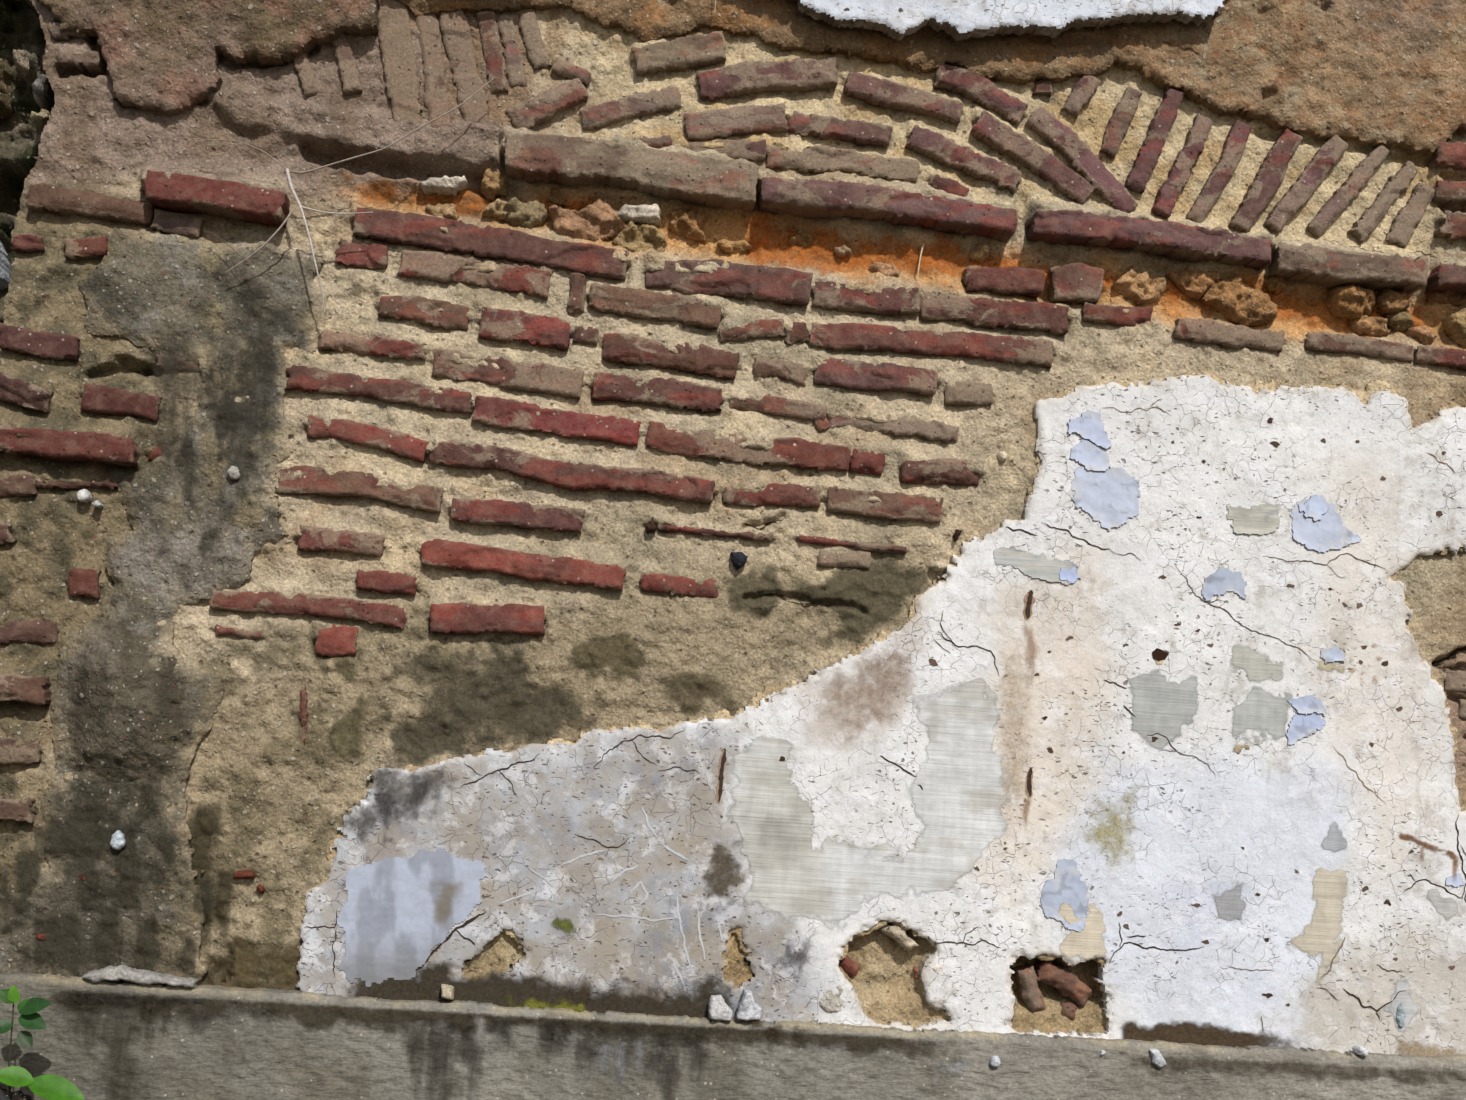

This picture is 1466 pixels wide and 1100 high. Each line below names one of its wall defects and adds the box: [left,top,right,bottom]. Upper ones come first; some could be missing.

leakage [158,282,302,507]
crack [1006,522,1139,559]
leakage [329,697,364,757]
leakage [346,637,595,839]
peeling [1129,648,1198,749]
peeling [337,847,486,987]
crack [416,911,486,970]
leakage [0,783,931,1100]
peeling [727,674,1011,1027]
spalling [1009,859,1130,1056]
crack [1109,923,1273,971]
crack [1405,815,1466,901]